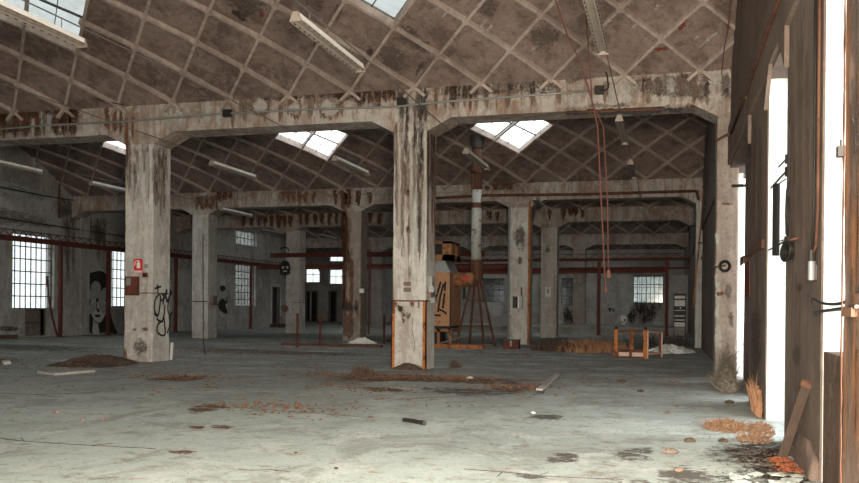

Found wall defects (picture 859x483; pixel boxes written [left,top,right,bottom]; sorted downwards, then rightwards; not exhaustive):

corrosion [0,109,78,138]
damp [588,69,731,105]
corrosion [195,191,234,210]
damp [202,78,590,276]
corrosion [242,189,382,327]
damp [714,264,722,362]